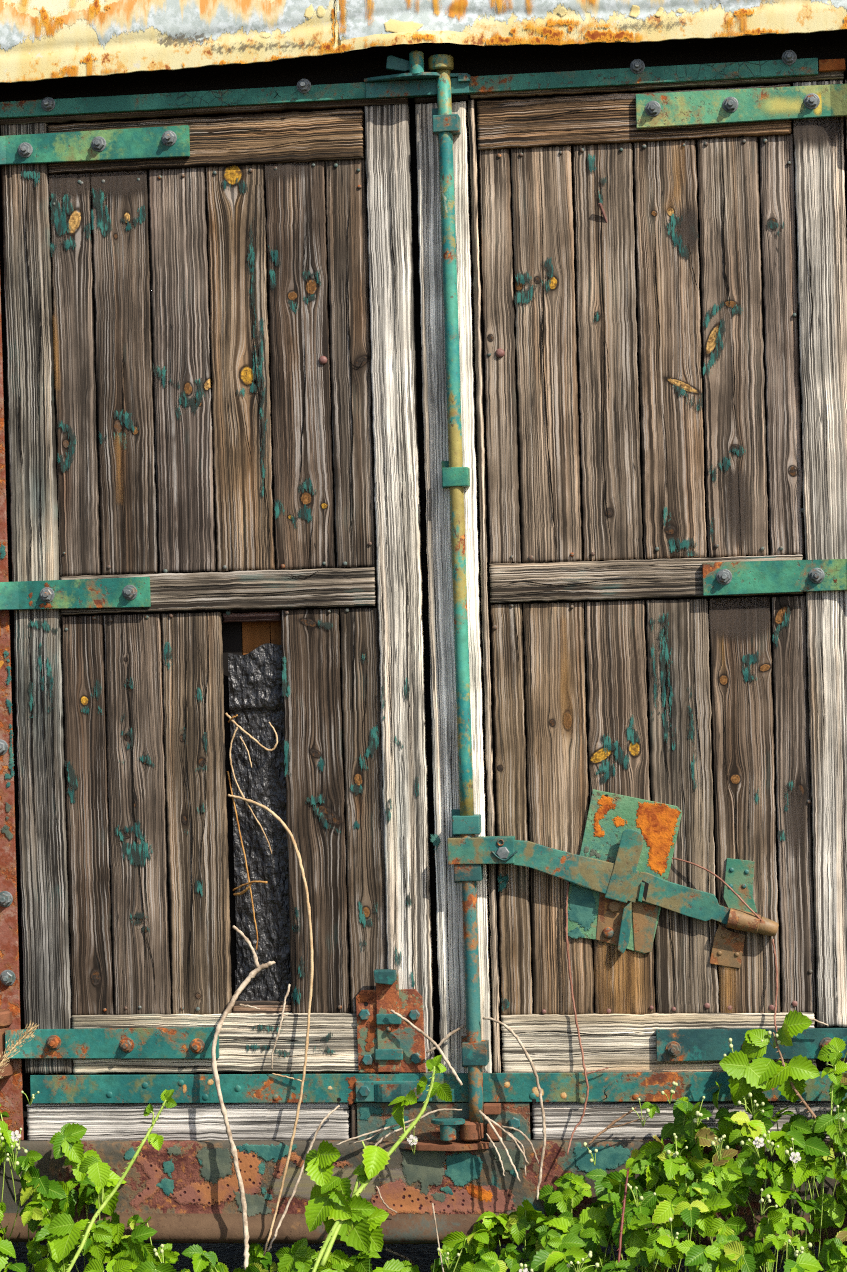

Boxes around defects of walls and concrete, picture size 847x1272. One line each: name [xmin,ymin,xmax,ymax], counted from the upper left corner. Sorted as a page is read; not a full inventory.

rust [20,0,64,37]
rust [320,0,385,55]
peeling [0,0,779,51]
rust [407,0,468,20]
rust [482,0,642,45]
rust [715,8,788,37]
peeling [811,0,847,9]
rust [3,52,119,83]
rust [592,795,681,876]
rust [346,1020,377,1105]
rust [130,1149,304,1207]
rust [371,1178,516,1215]